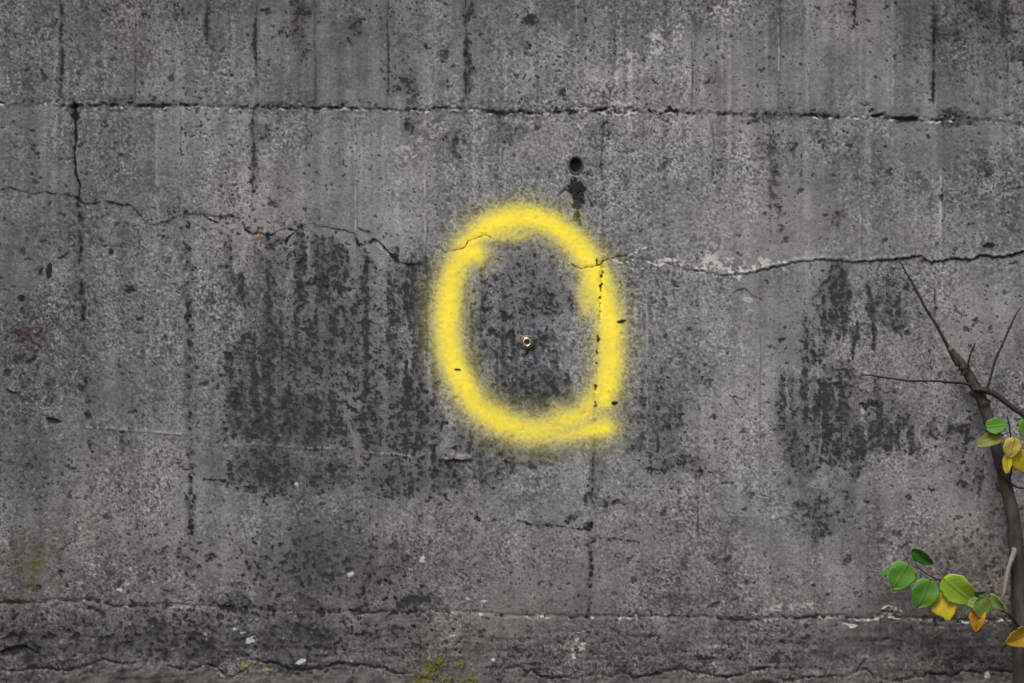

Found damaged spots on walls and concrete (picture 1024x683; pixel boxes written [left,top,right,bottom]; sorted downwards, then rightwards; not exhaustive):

crack [0,102,491,265]
damp [221,220,581,502]
crack [570,250,1024,299]
damp [768,258,987,495]